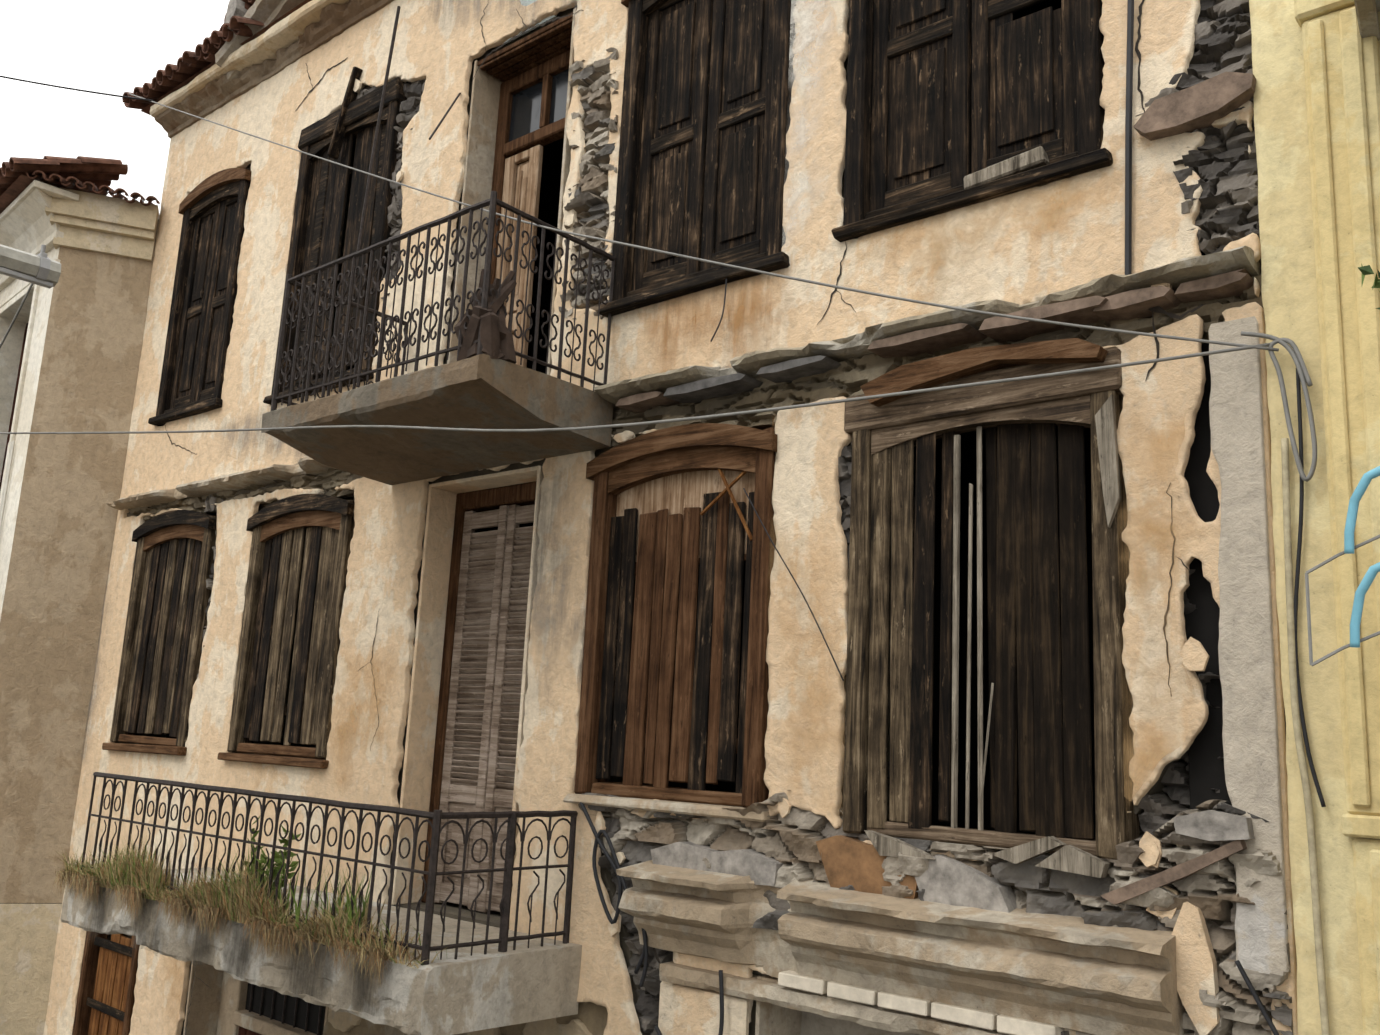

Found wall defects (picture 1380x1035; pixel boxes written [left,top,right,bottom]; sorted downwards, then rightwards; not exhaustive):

flaking render [353,79,377,100]
flaking render [1136,0,1253,116]
flaking render [381,79,426,299]
flaking render [1173,97,1260,255]
flaking render [607,259,1265,449]
crack [1163,482,1220,708]
flaking render [778,798,791,818]
flaking render [1139,831,1162,868]
crack [1136,750,1224,839]
spalling [594,811,674,1035]
flaking render [323,1007,408,1035]
flaking render [454,1002,608,1035]